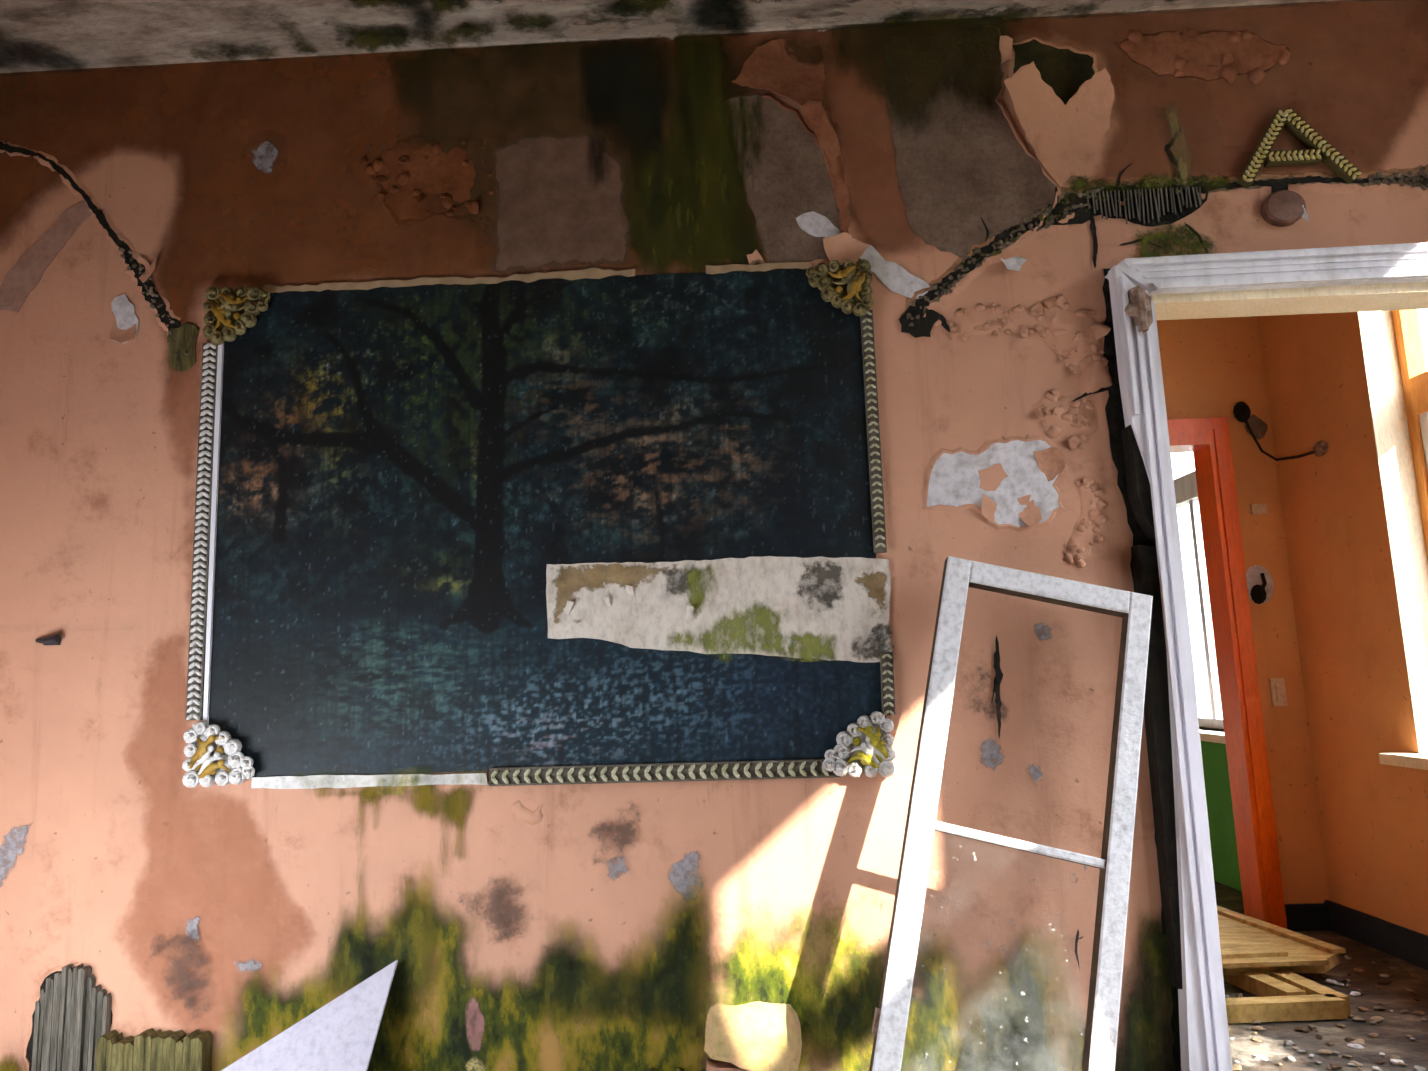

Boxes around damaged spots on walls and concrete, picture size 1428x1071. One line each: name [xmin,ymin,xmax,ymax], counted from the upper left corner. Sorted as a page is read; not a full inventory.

crack [0,140,199,372]
leakage [0,0,1428,325]
spalling [727,0,1150,299]
crack [899,128,1428,338]
spalling [922,435,1069,532]
crack [1073,386,1116,401]
crack [991,636,1003,739]
mould [461,880,521,940]